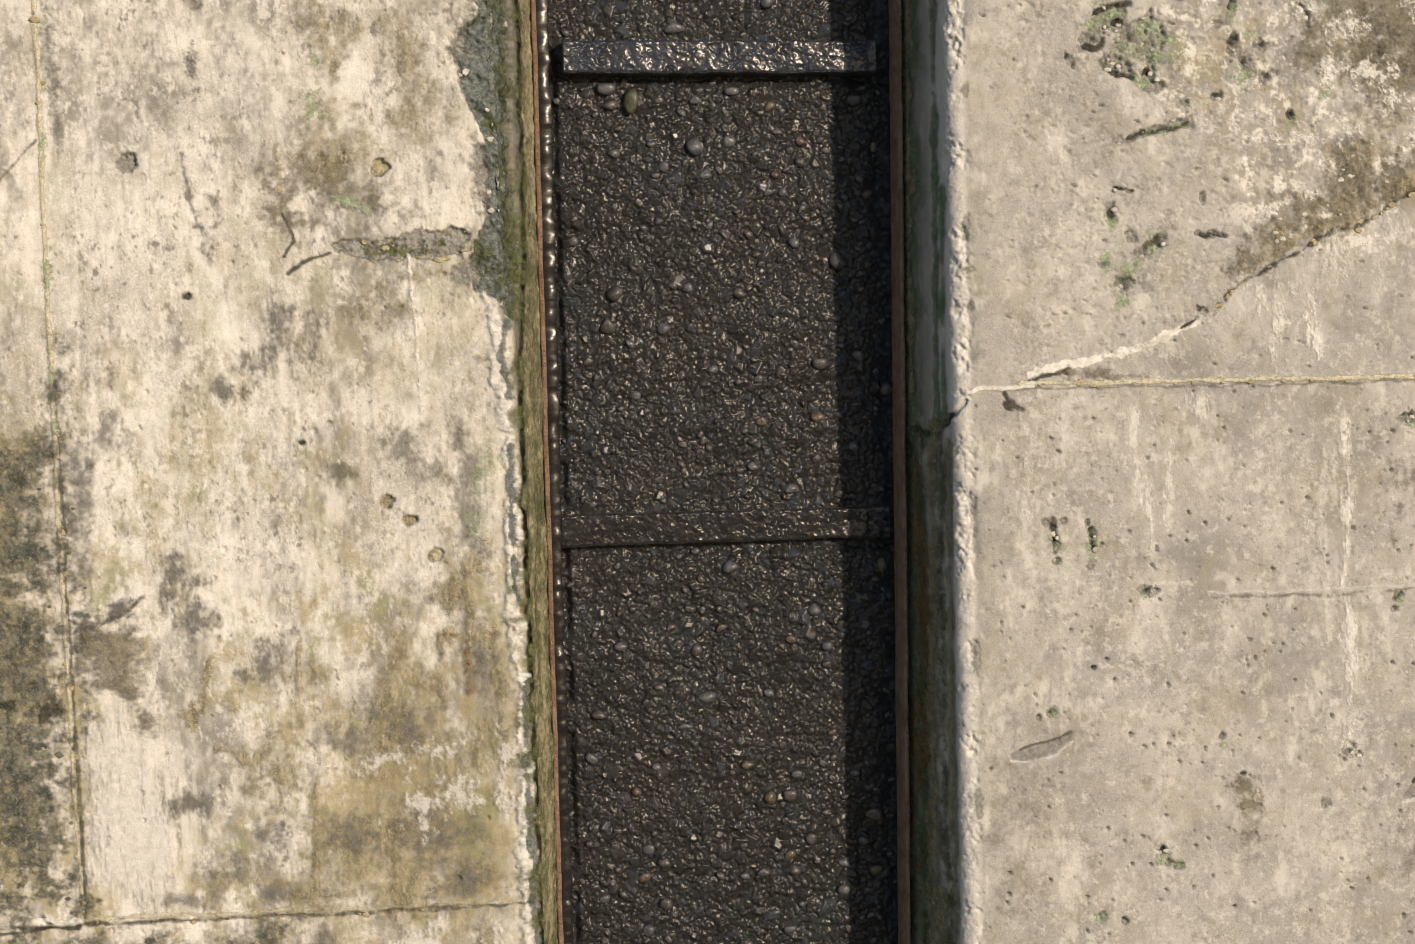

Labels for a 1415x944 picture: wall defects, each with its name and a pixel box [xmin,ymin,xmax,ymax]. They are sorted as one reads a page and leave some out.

leakage [0,426,93,746]
leakage [47,67,63,145]
leakage [48,369,63,403]
leakage [72,600,156,733]
leakage [159,0,559,944]
spalling [281,0,542,944]
crack [913,180,1415,469]
leakage [1229,0,1415,371]
leakage [0,768,84,899]